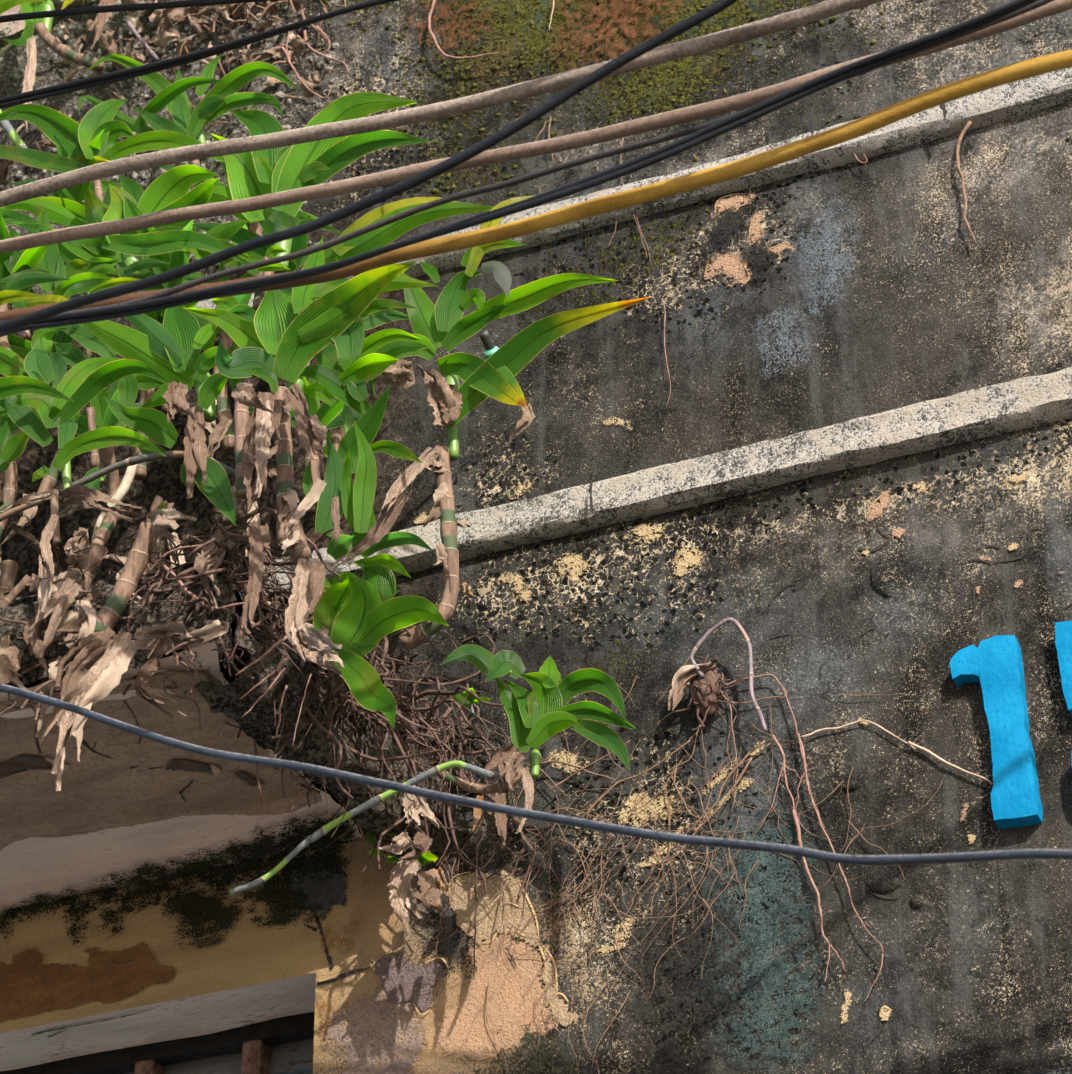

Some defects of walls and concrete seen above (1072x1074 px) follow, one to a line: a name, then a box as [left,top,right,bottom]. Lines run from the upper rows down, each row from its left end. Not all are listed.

damp [403,0,492,53]
damp [553,0,683,69]
spalling [704,193,795,287]
damp [0,670,360,1022]
peeling [319,870,583,1074]